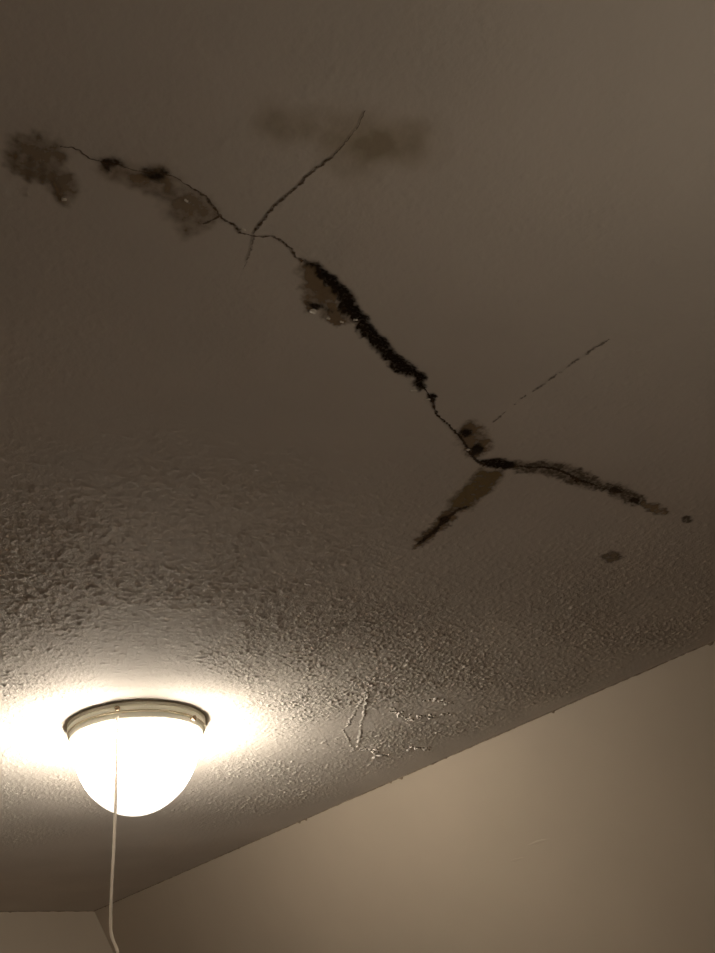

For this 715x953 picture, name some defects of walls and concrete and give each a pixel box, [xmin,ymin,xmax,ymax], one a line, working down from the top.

water stain [7,135,77,202]
crack [60,111,692,523]
crack [413,506,469,549]